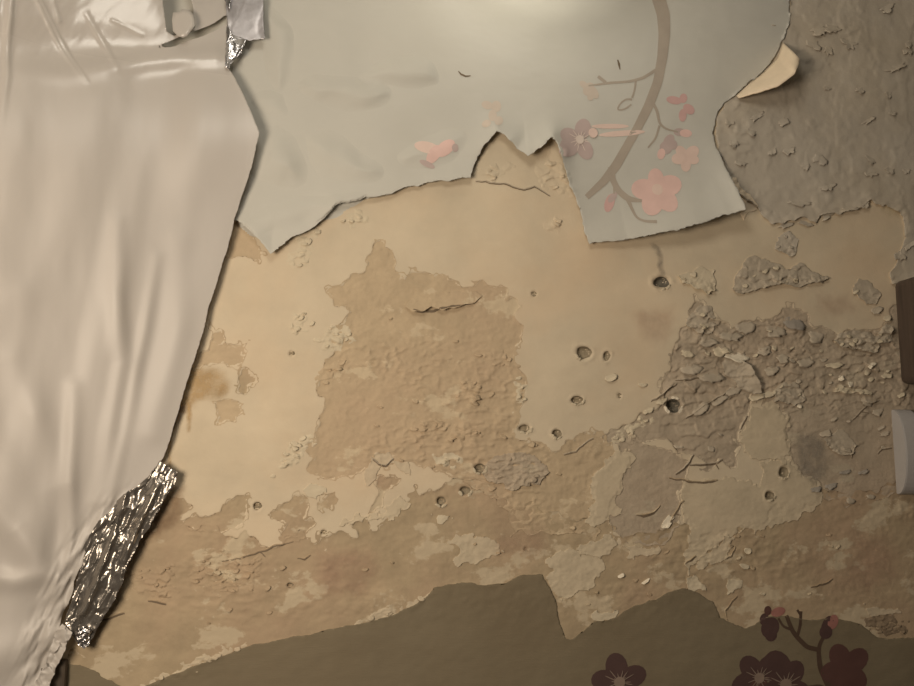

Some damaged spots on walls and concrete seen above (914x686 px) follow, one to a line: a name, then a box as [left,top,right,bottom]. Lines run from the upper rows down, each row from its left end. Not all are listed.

spalling [224,220,268,265]
peeling [716,0,914,294]
spalling [67,239,914,686]